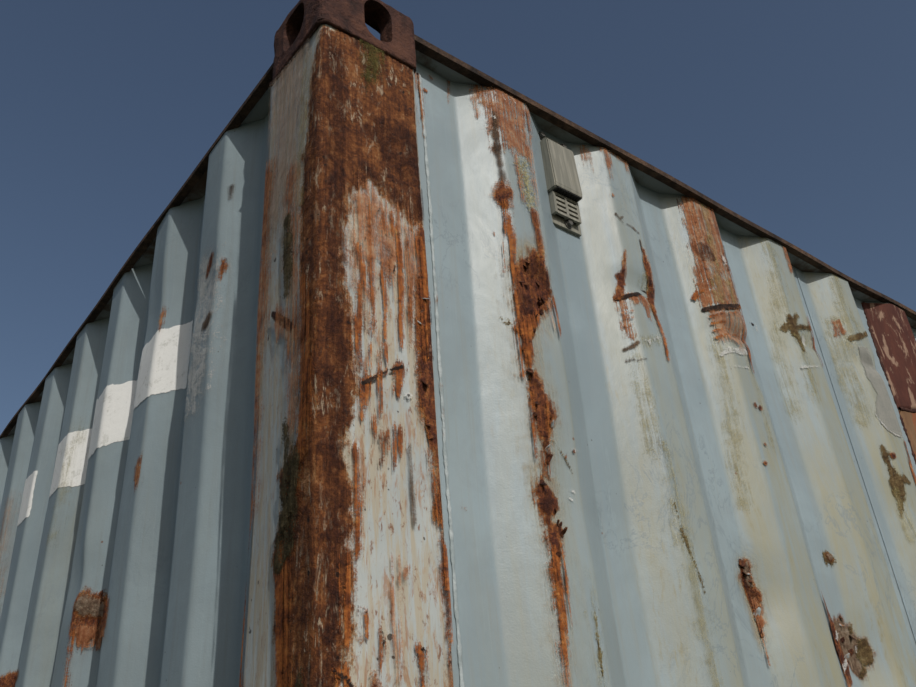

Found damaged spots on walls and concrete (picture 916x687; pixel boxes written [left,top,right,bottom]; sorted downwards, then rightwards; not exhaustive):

corrosion [206,252,228,280]
corrosion [248,25,453,687]
corrosion [469,85,573,687]
corrosion [613,249,669,360]
corrosion [677,196,754,372]
corrosion [879,440,916,518]
corrosion [0,671,19,687]
corrosion [63,589,110,687]
corrosion [739,558,771,665]